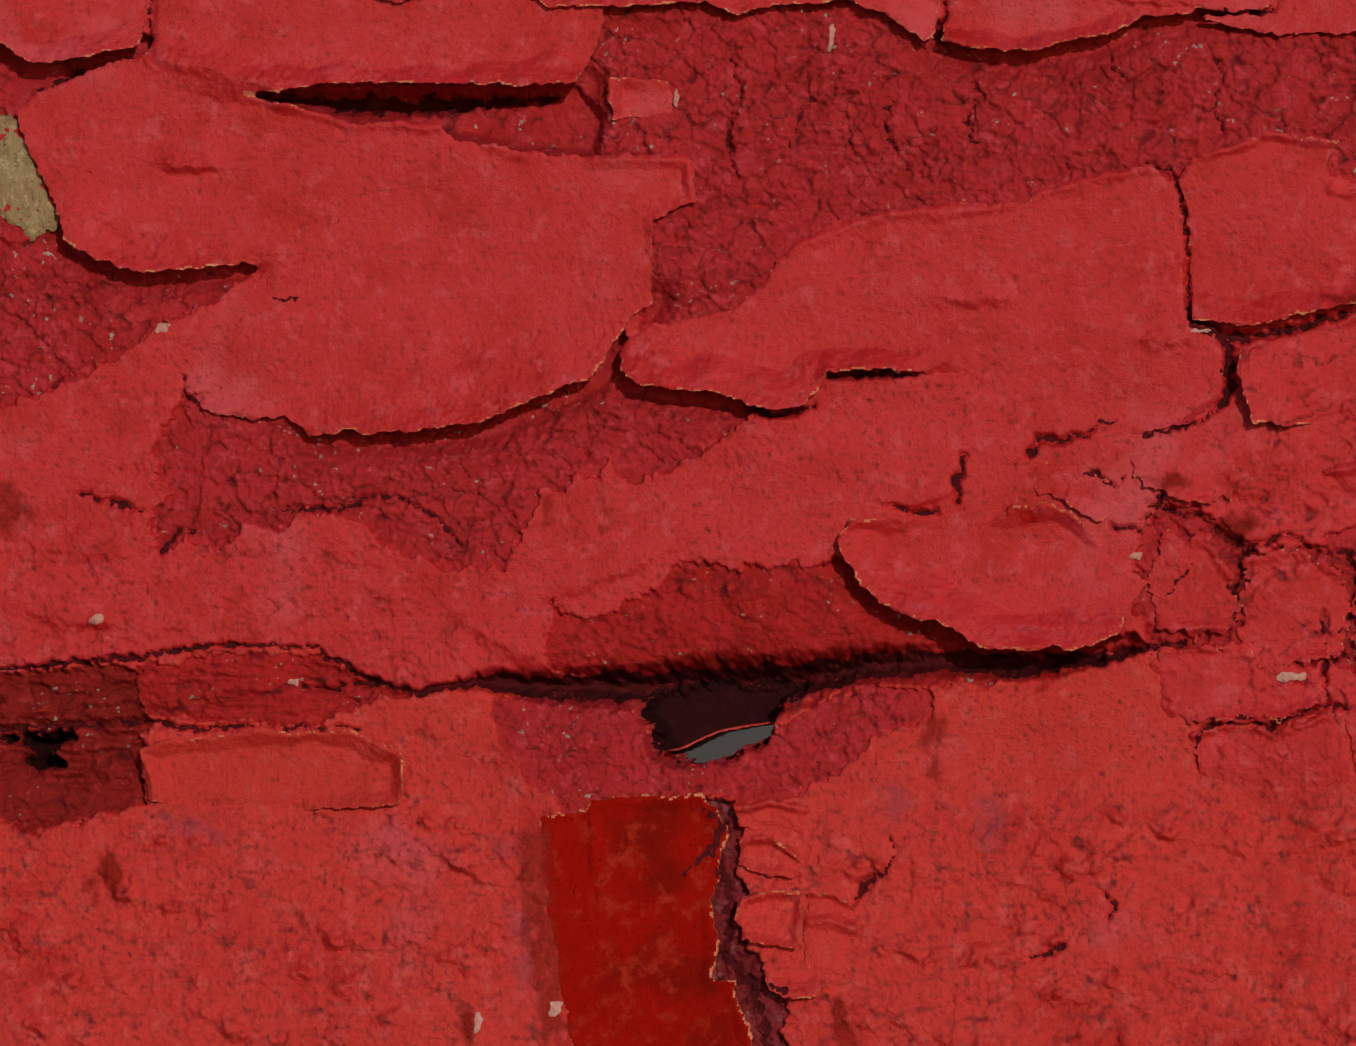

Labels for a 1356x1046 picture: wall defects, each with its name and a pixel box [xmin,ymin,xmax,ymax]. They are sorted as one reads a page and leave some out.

crack [936,1,948,43]
crack [725,129,738,176]
crack [729,58,744,99]
crack [788,75,815,148]
crack [882,101,909,170]
crack [962,81,986,144]
crack [1212,58,1223,131]
peeling [0,0,1356,572]
crack [0,639,1188,705]
crack [0,718,360,734]
peeling [0,651,412,832]
peeling [491,448,1356,1046]